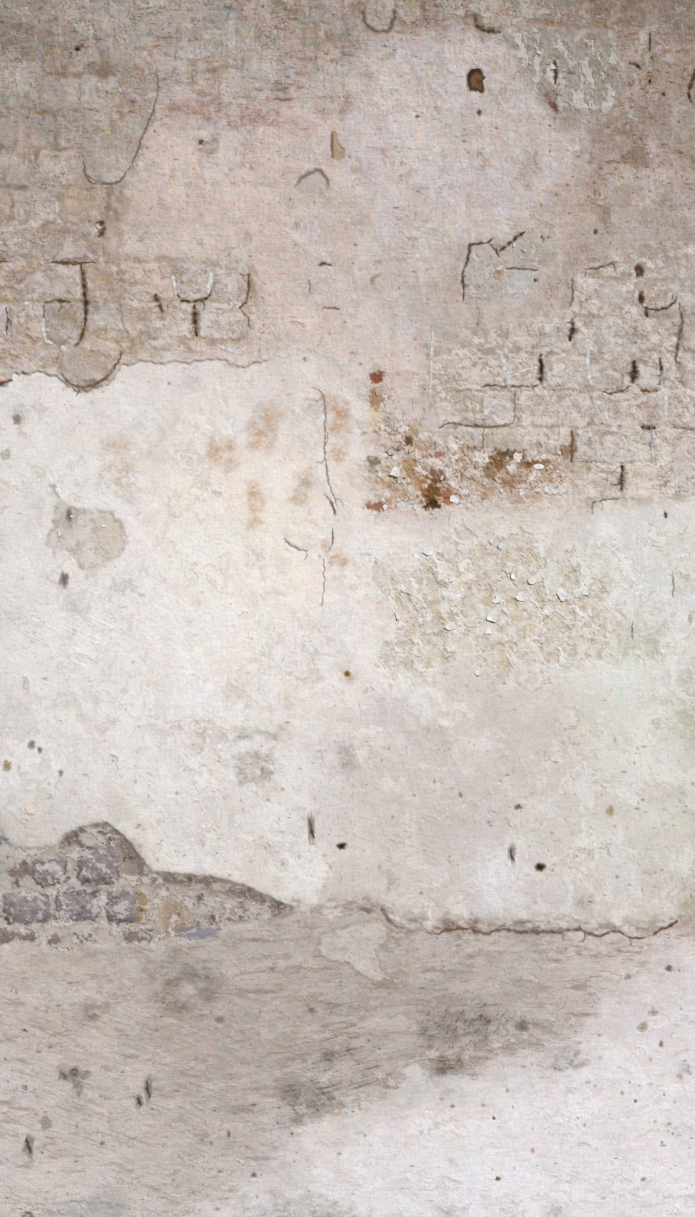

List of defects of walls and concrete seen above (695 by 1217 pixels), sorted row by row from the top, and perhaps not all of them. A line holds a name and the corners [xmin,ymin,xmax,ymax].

spalling [362,0,397,33]
peeling [507,27,624,121]
spalling [296,169,331,201]
spalling [331,132,345,163]
spalling [0,202,260,393]
crack [284,389,343,605]
spalling [356,231,695,698]
spalling [0,823,292,953]
crack [360,908,398,929]
crack [430,920,678,945]